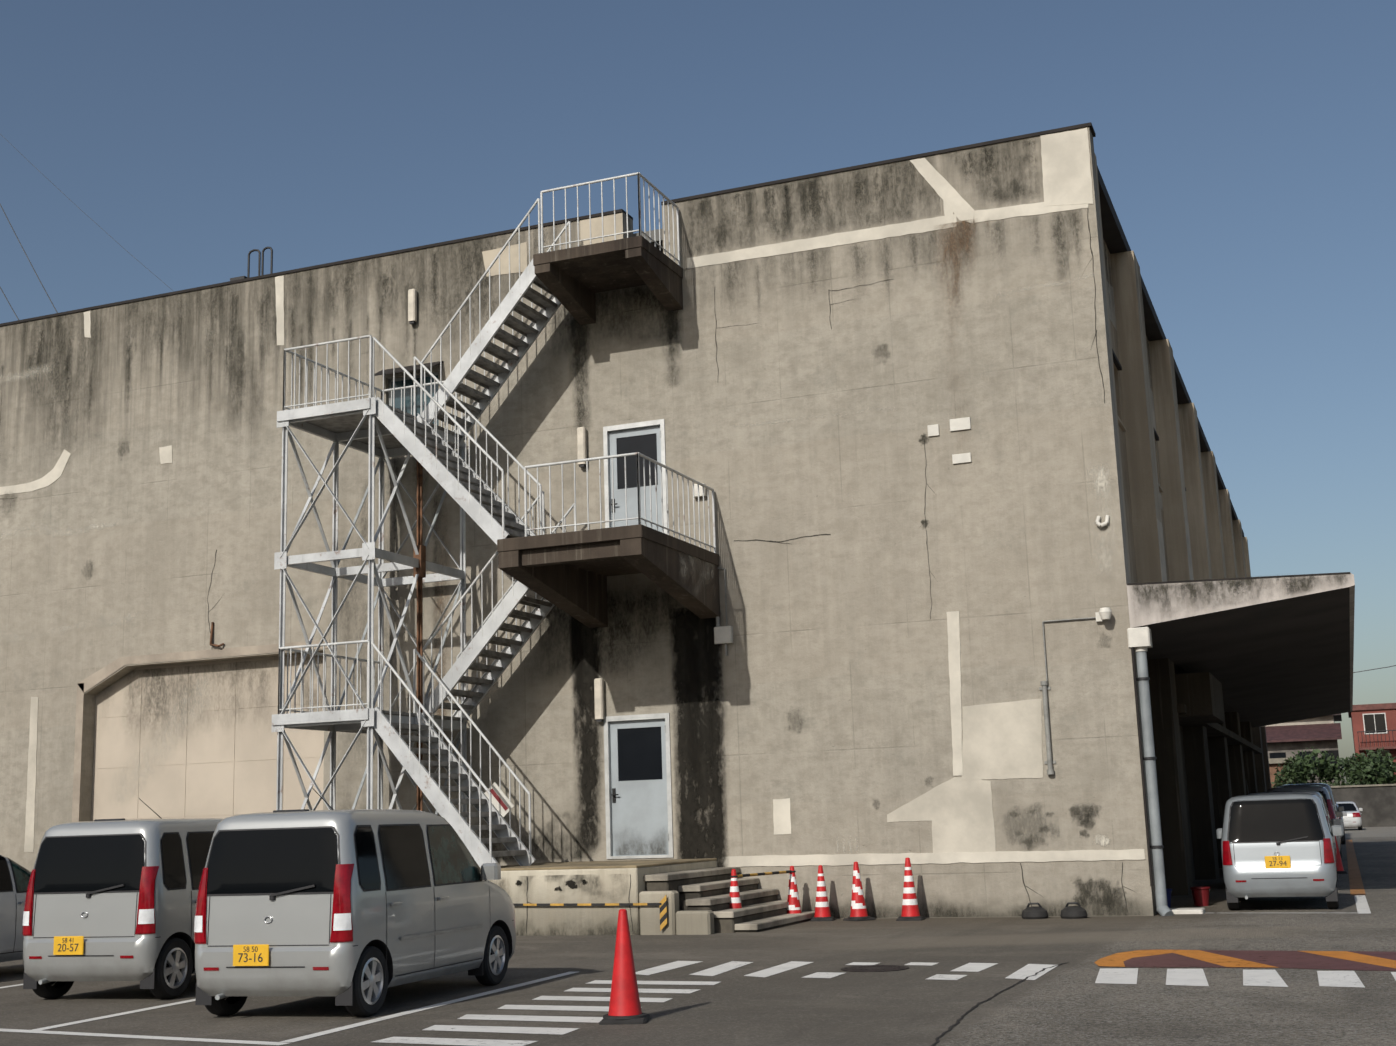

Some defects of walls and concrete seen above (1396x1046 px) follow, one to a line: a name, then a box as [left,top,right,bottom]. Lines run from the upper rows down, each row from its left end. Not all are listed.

damp [689,191,750,251]
damp [765,162,921,236]
damp [956,139,1027,199]
damp [411,239,493,316]
crack [920,444,938,619]
damp [483,591,726,891]